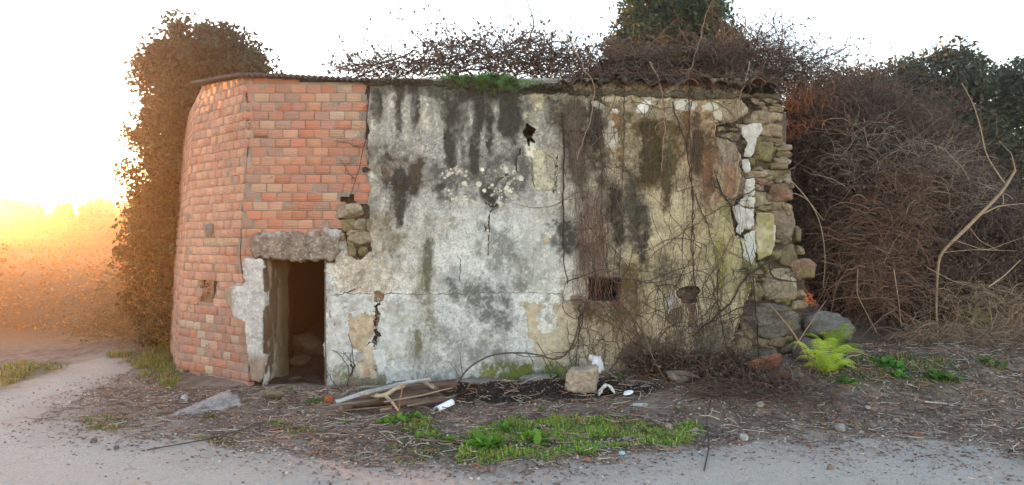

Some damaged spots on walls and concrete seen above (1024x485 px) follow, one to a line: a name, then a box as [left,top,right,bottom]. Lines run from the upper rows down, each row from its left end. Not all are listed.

water stain [367,78,684,286]
peeling [326,290,415,386]
crack [334,258,581,376]
peeling [519,288,625,367]